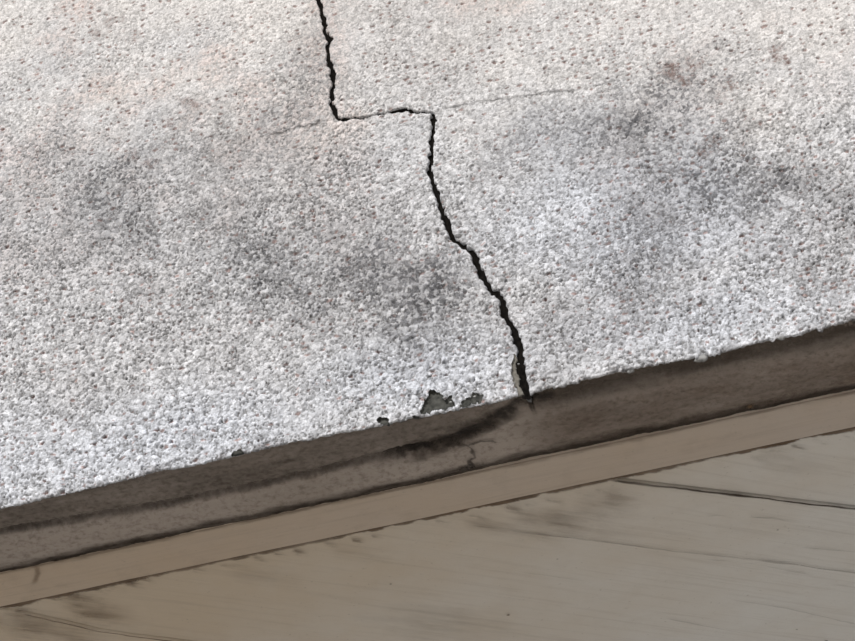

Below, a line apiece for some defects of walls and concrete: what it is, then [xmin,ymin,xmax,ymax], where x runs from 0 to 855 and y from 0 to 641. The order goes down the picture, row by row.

crack [277,0,534,400]
spalling [412,389,484,419]